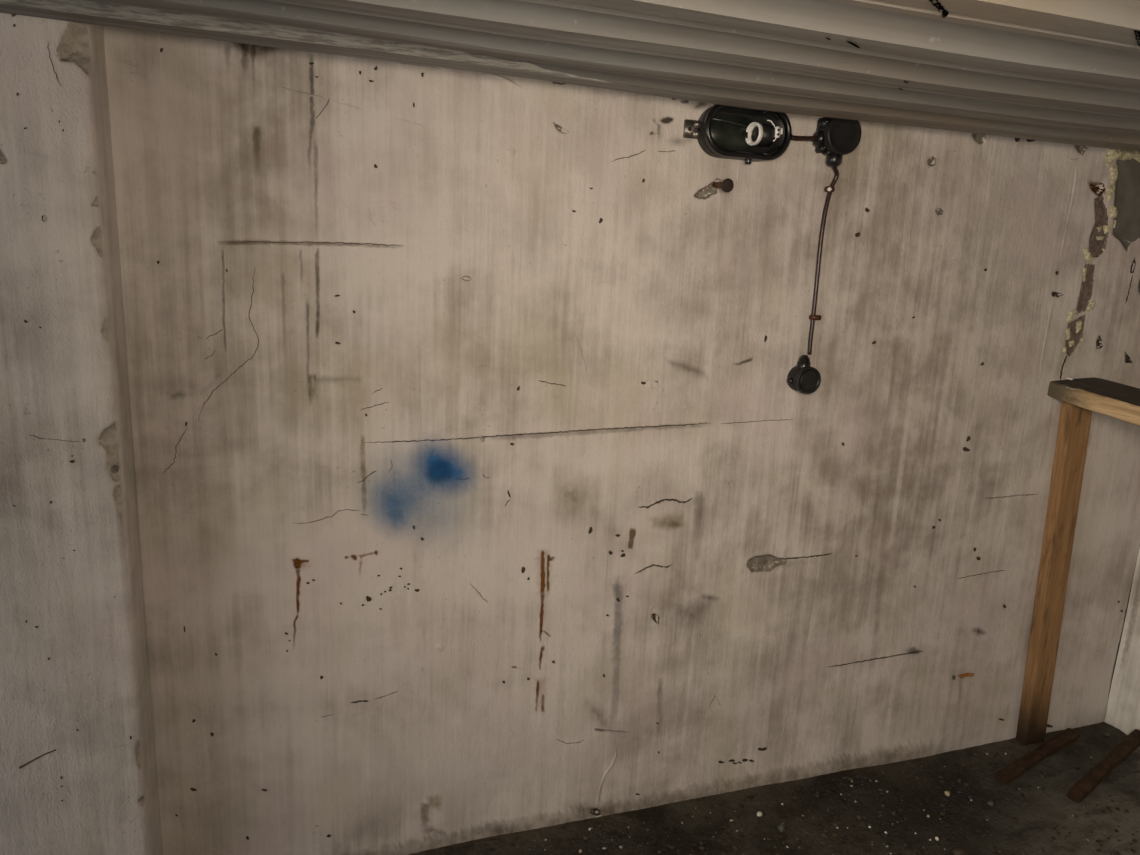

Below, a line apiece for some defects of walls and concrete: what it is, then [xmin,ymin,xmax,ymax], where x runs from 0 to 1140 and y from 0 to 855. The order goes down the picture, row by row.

peeling [1063,159,1140,356]
crack [162,266,259,474]
corrosion [293,558,308,631]
corrosion [539,551,555,664]